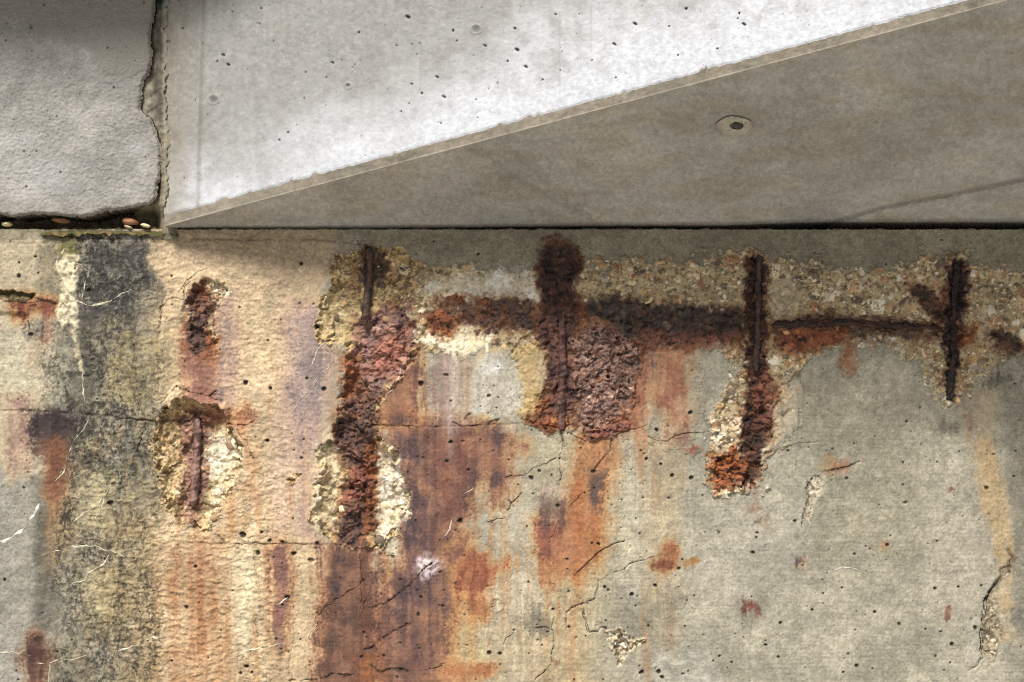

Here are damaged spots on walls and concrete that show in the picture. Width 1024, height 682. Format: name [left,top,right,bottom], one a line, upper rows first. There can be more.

rust [0,284,60,347]
leakage [51,235,85,376]
spalling [307,232,1024,550]
rust [0,383,87,583]
spalling [144,396,249,532]
rust [138,345,707,682]
crack [488,422,708,522]
rust [10,617,62,682]
crack [230,520,452,658]
crack [292,625,443,681]
crack [535,541,658,680]
crack [972,551,1013,668]